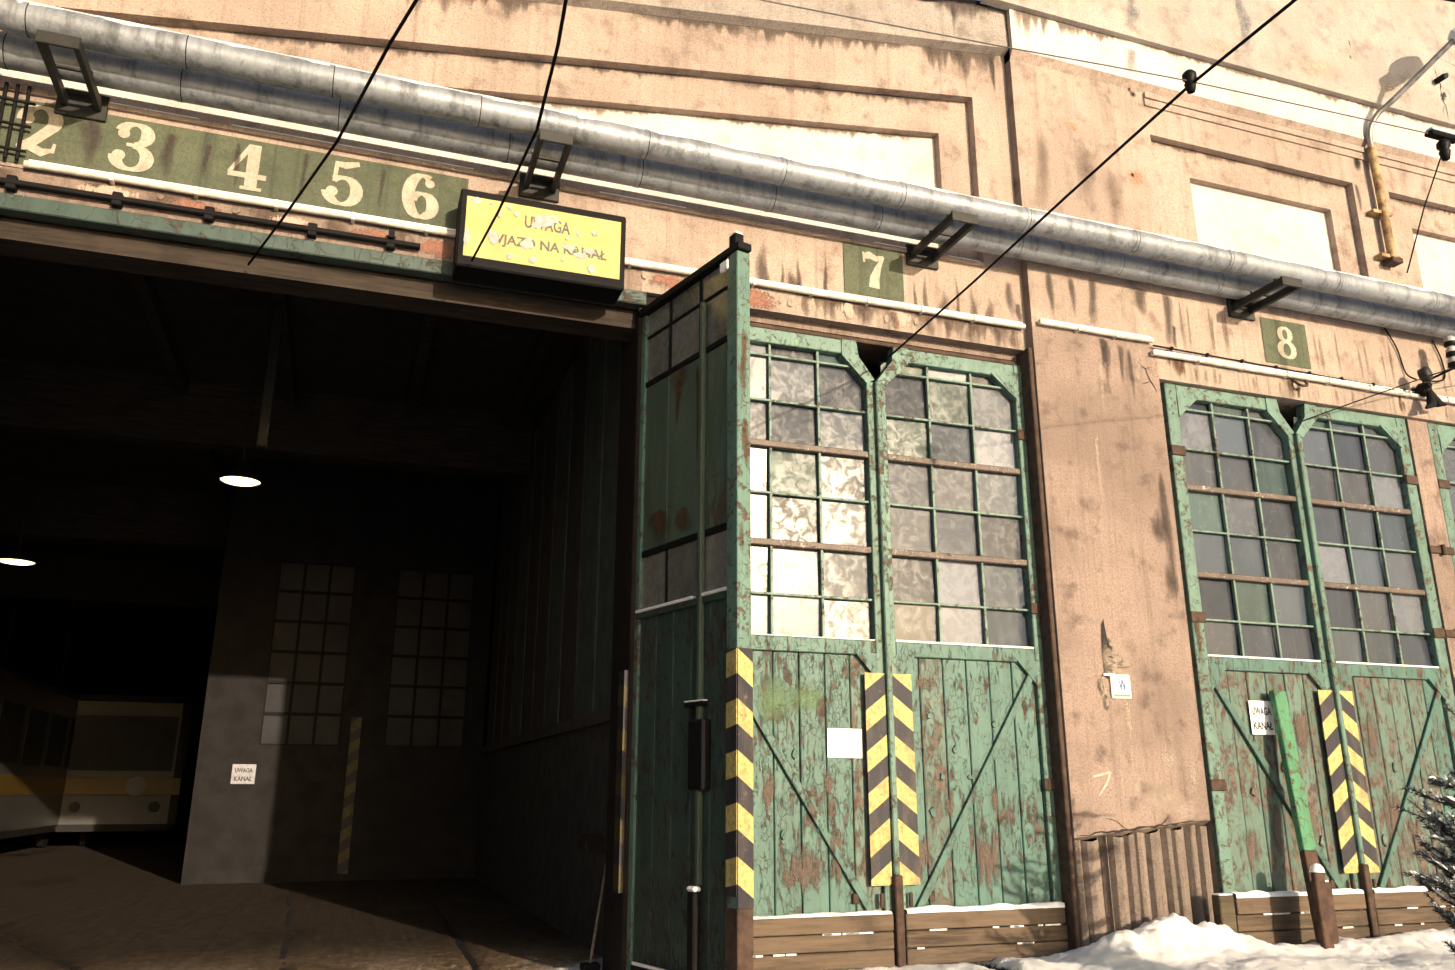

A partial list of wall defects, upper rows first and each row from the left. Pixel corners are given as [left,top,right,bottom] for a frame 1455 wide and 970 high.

leakage [1238,0,1249,30]
leakage [1016,10,1135,59]
leakage [1154,47,1273,80]
leakage [1314,91,1435,124]
leakage [1070,279,1095,312]
leakage [1136,289,1144,309]
leakage [1165,296,1176,346]
leakage [1100,339,1133,380]